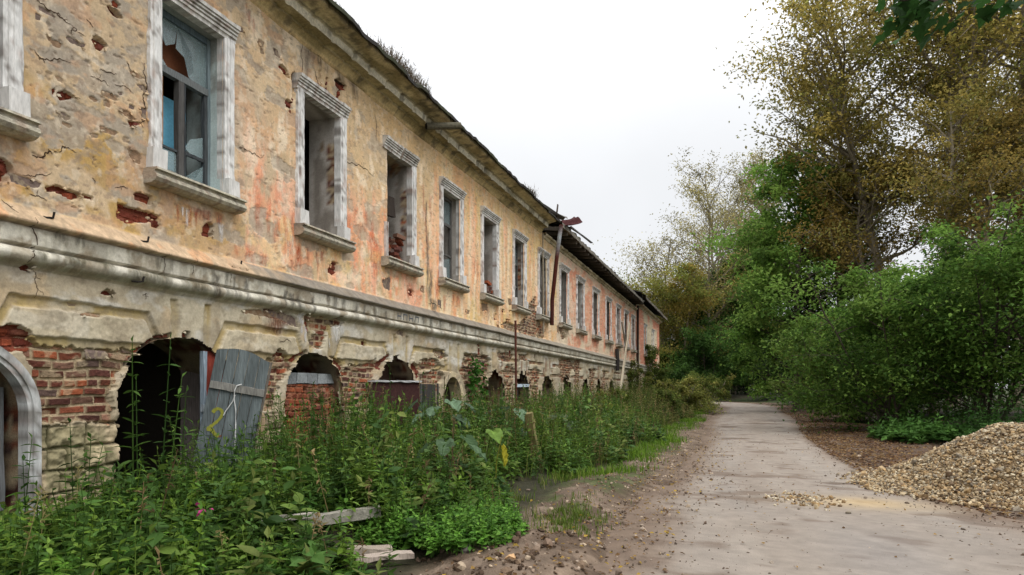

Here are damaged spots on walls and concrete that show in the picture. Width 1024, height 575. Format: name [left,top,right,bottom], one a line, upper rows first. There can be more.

crack [37,0,93,35]
flaking render [46,34,107,51]
flaking render [52,76,149,129]
flaking render [0,159,91,200]
crack [1,146,76,298]
flaking render [116,192,162,229]
flaking render [0,324,167,426]
flaking render [241,309,346,411]
flaking render [411,350,445,388]
flaking render [459,297,544,406]